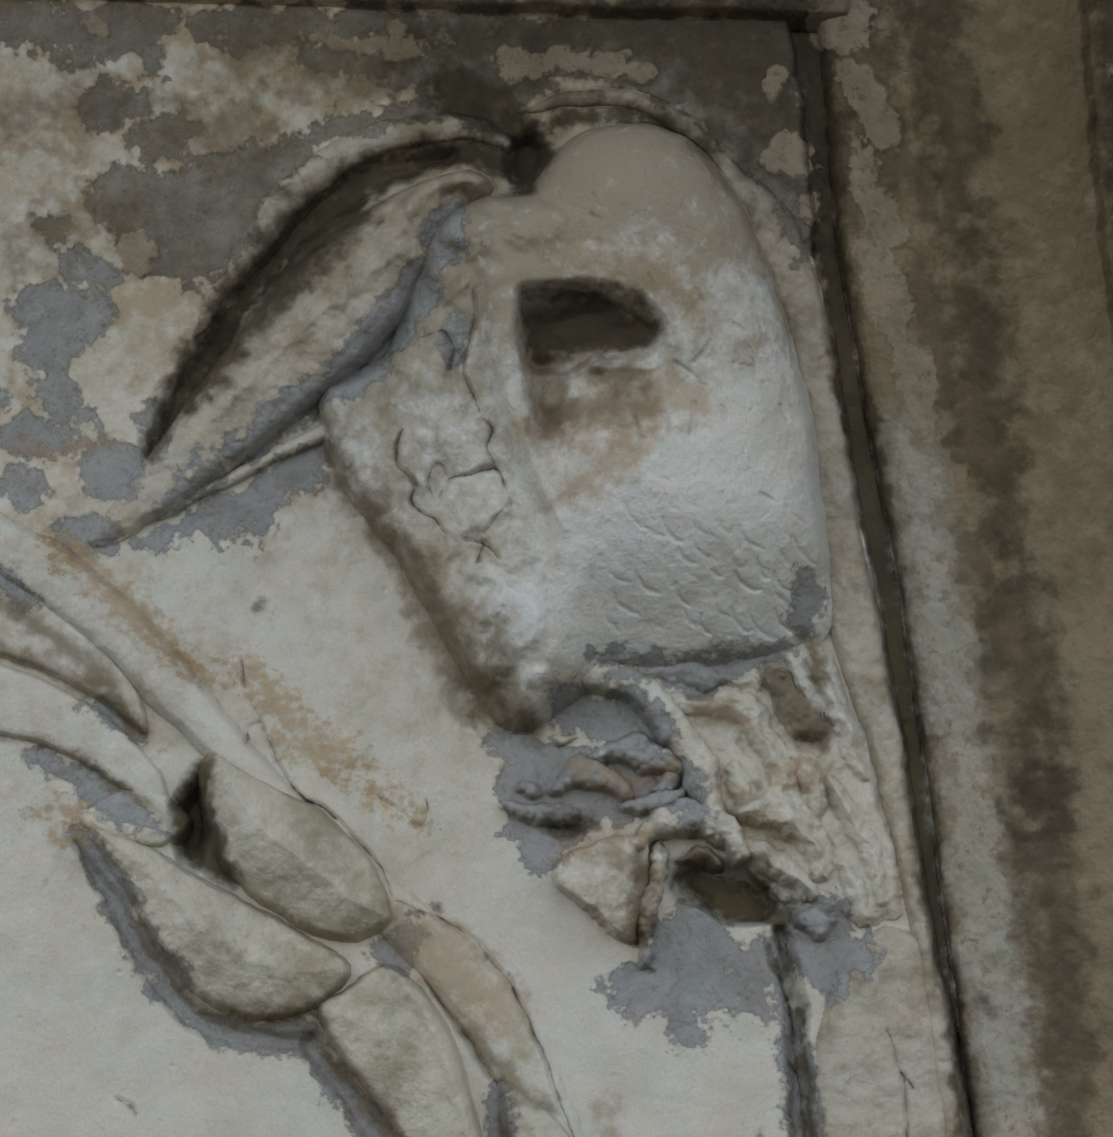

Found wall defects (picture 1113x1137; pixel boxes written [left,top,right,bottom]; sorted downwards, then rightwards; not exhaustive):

peeling [0,0,820,558]
peeling [481,562,830,878]
peeling [805,0,1046,1137]
water stain [979,582,1064,807]
peeling [591,886,886,1137]